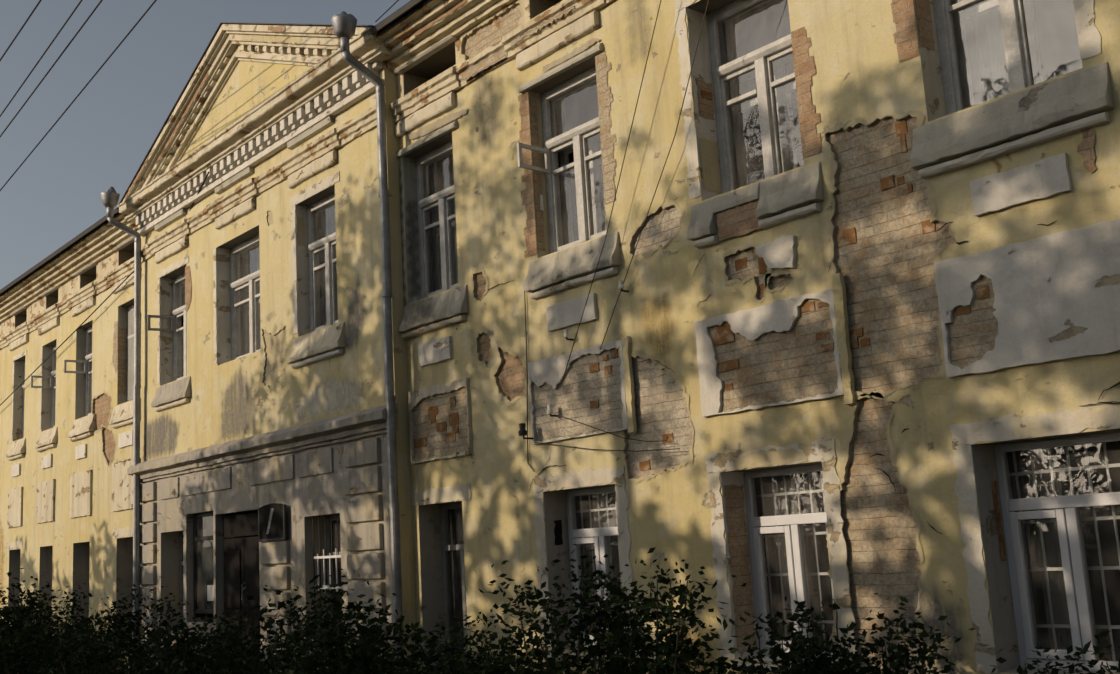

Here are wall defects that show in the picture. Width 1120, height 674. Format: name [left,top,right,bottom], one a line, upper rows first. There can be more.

spalling [461,3,520,60]
spalling [808,55,917,273]
spalling [630,205,674,255]
spalling [724,233,791,300]
flaking render [801,301,829,313]
flaking render [954,285,990,316]
flaking render [712,322,735,346]
flaking render [589,349,650,375]
flaking render [718,359,739,390]
crack [1083,382,1120,406]
flaking render [414,396,459,448]
spalling [624,430,674,479]